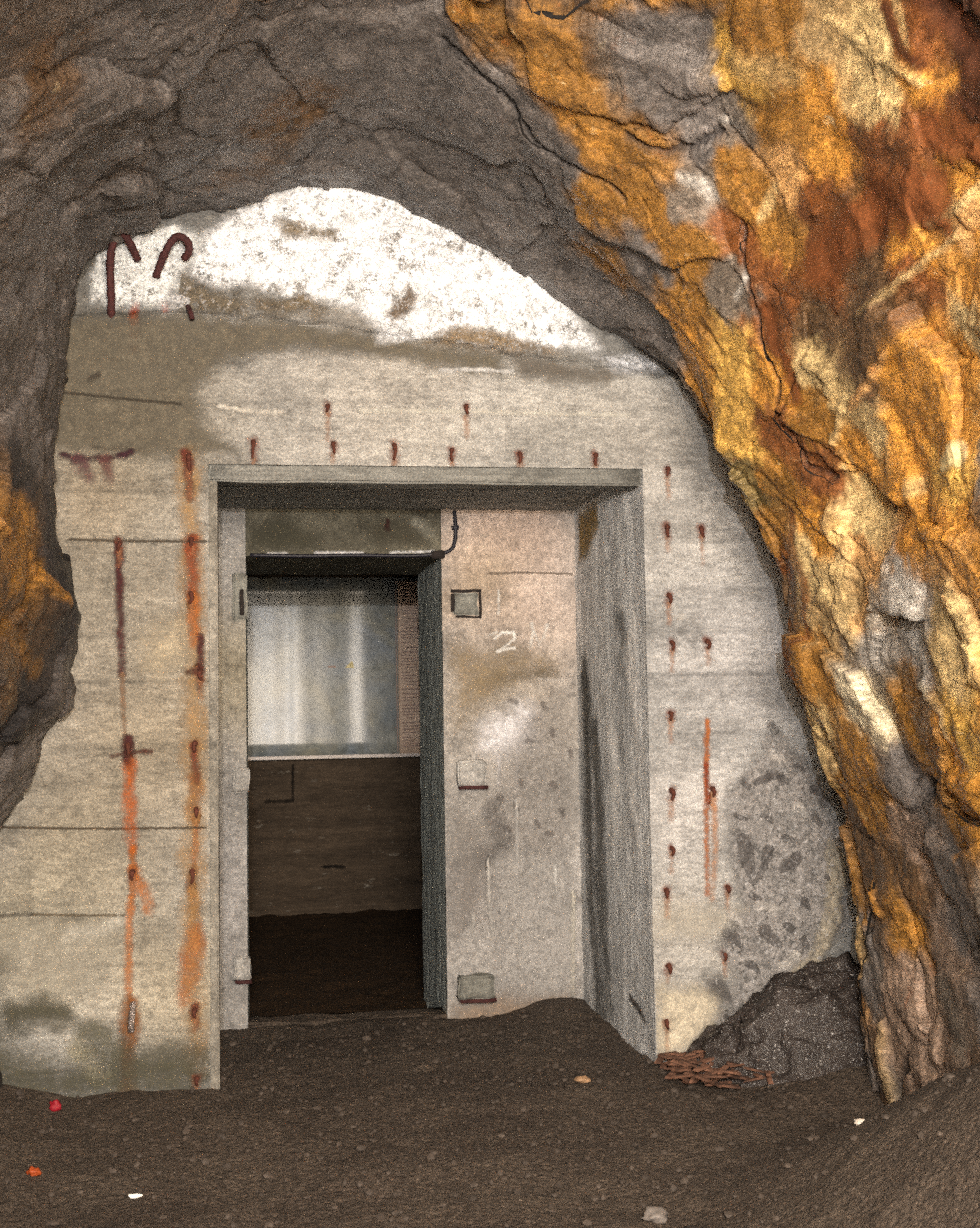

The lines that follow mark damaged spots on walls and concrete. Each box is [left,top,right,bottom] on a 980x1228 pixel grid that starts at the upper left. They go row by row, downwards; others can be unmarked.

corrosion [60,449,133,476]
corrosion [114,538,125,707]
corrosion [181,449,204,846]
corrosion [118,735,153,825]
corrosion [704,719,717,892]
leakage [5,996,71,1026]
leakage [13,918,124,980]
leakage [0,1024,206,1098]
corrosion [121,845,143,1062]
corrosion [182,868,202,1026]